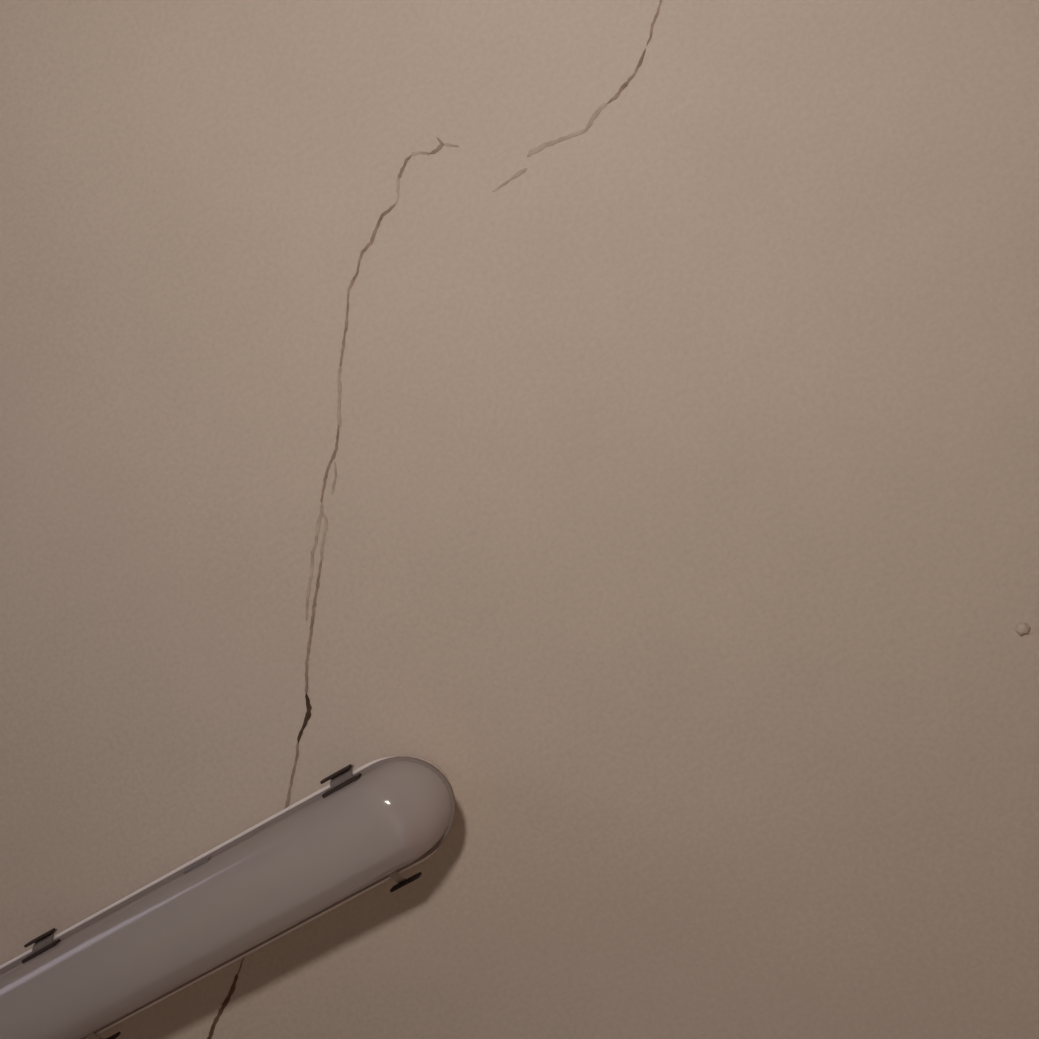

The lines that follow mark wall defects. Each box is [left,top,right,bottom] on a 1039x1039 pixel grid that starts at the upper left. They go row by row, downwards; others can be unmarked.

crack [492,0,663,192]
crack [284,138,459,809]
crack [207,956,245,1039]